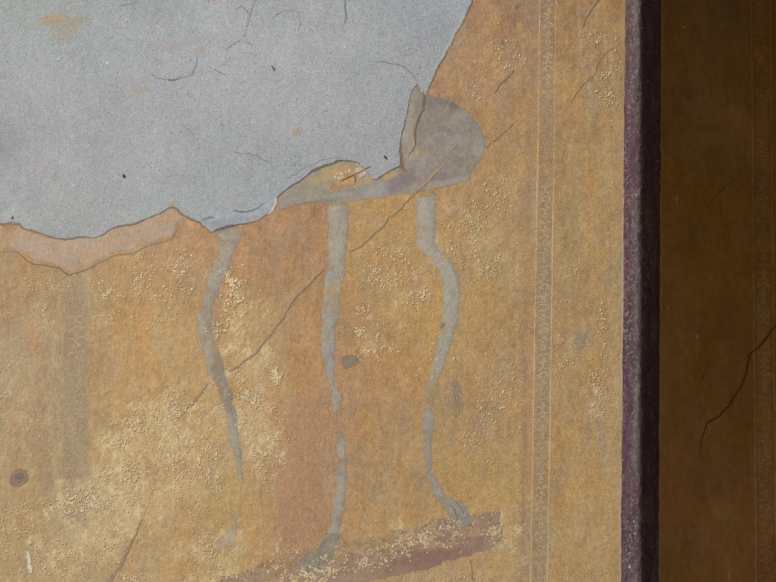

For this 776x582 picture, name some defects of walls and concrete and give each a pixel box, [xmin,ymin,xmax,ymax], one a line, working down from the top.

crack [149,56,226,81]
crack [227,0,256,49]
crack [350,163,445,252]
crack [228,269,323,372]
crack [165,383,208,442]
crack [698,325,776,458]
crack [108,462,160,582]